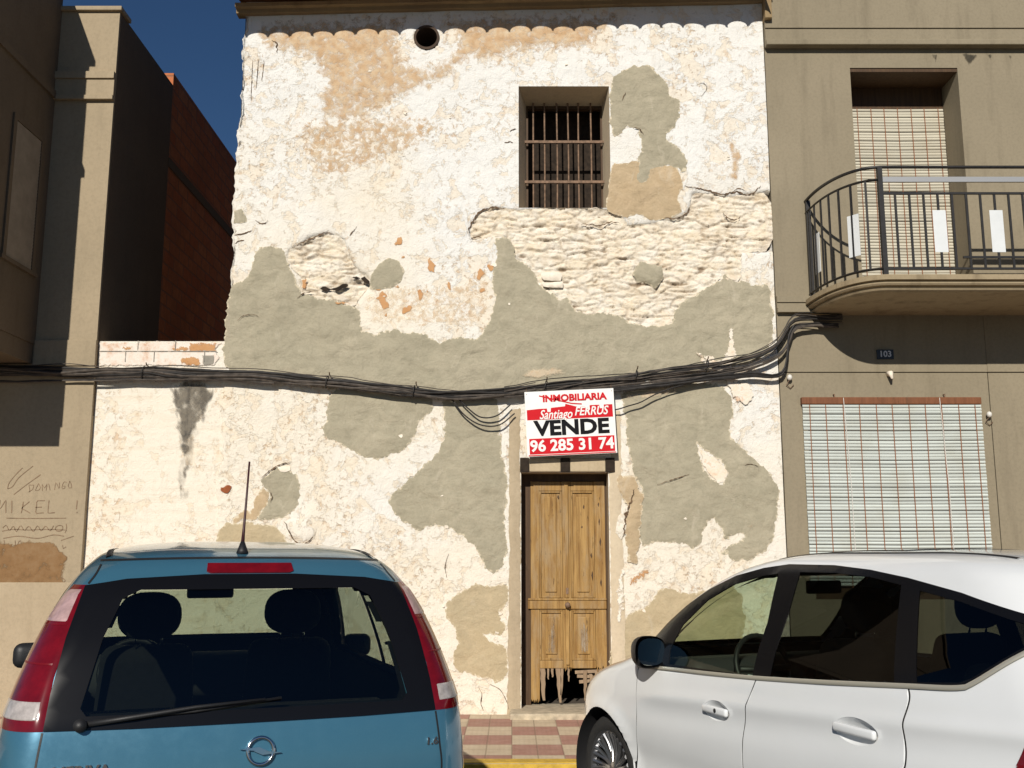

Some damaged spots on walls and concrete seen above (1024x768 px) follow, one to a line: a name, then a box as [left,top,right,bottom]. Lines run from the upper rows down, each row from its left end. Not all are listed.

spalling [288,234,497,335]
spalling [470,161,773,327]
damp [173,383,213,453]
peeling [0,542,67,582]
peeling [216,462,300,542]
peeling [615,475,649,585]
peeling [442,582,509,711]